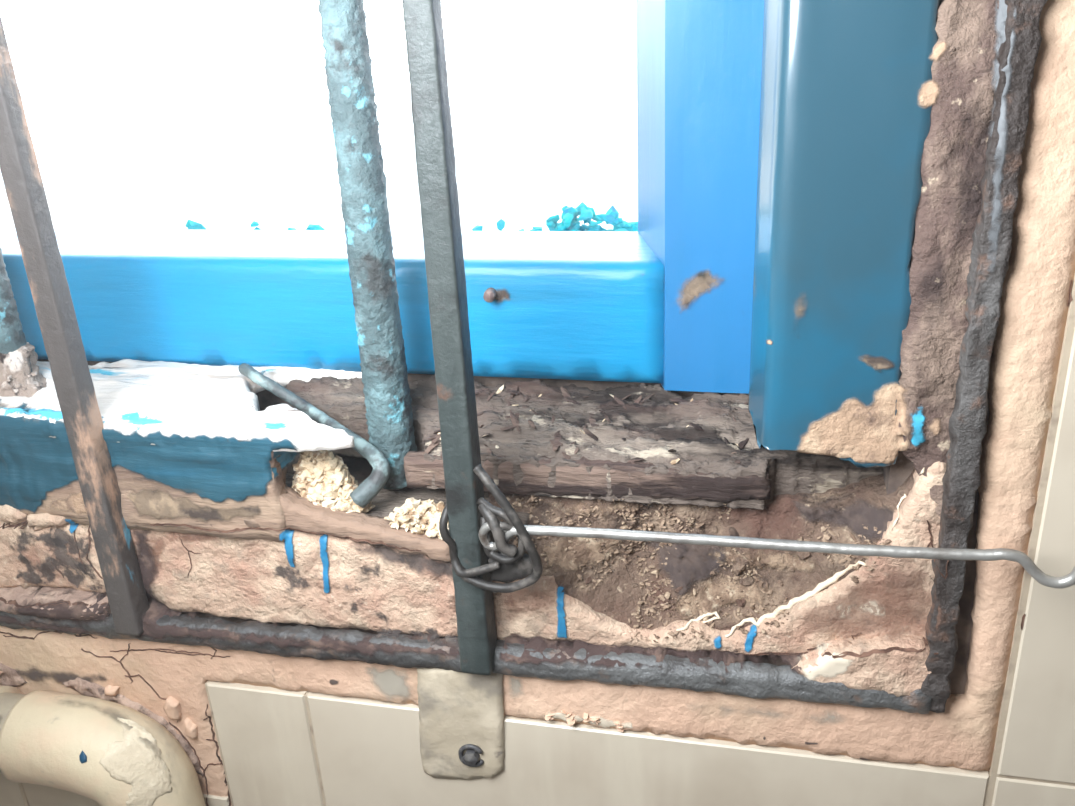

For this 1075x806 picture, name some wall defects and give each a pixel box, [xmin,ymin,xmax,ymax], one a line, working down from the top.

peeling [680,271,717,307]
peeling [861,355,894,370]
crack [0,520,28,529]
peeling [50,492,87,514]
peeling [128,489,260,522]
spalling [475,384,940,643]
mould [11,528,102,596]
crack [742,633,938,659]
crack [0,525,231,806]